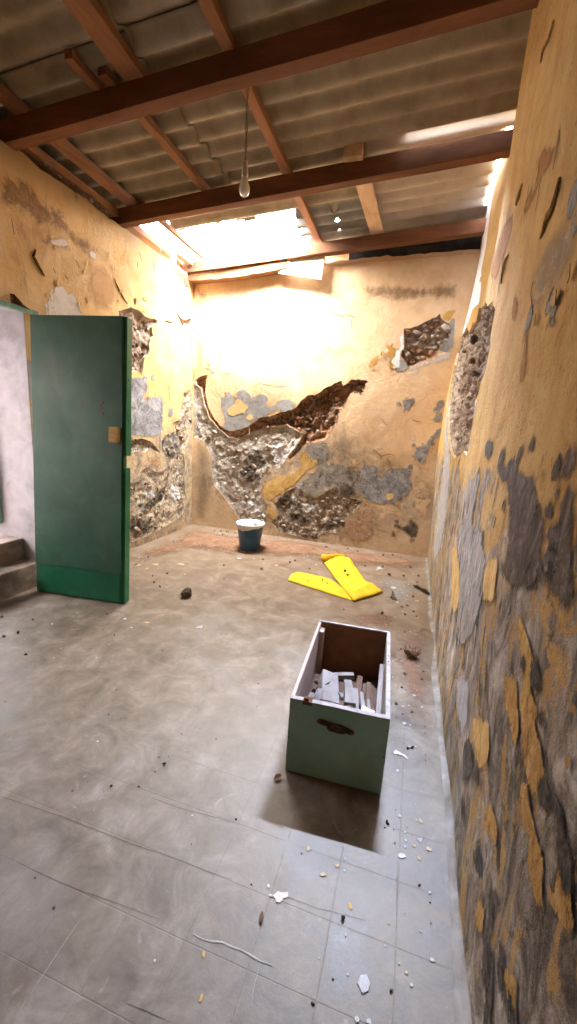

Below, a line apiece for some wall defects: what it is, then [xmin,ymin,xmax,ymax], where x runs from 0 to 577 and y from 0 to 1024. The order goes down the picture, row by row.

spalling [44,251,495,544]
peeling [525,264,570,333]